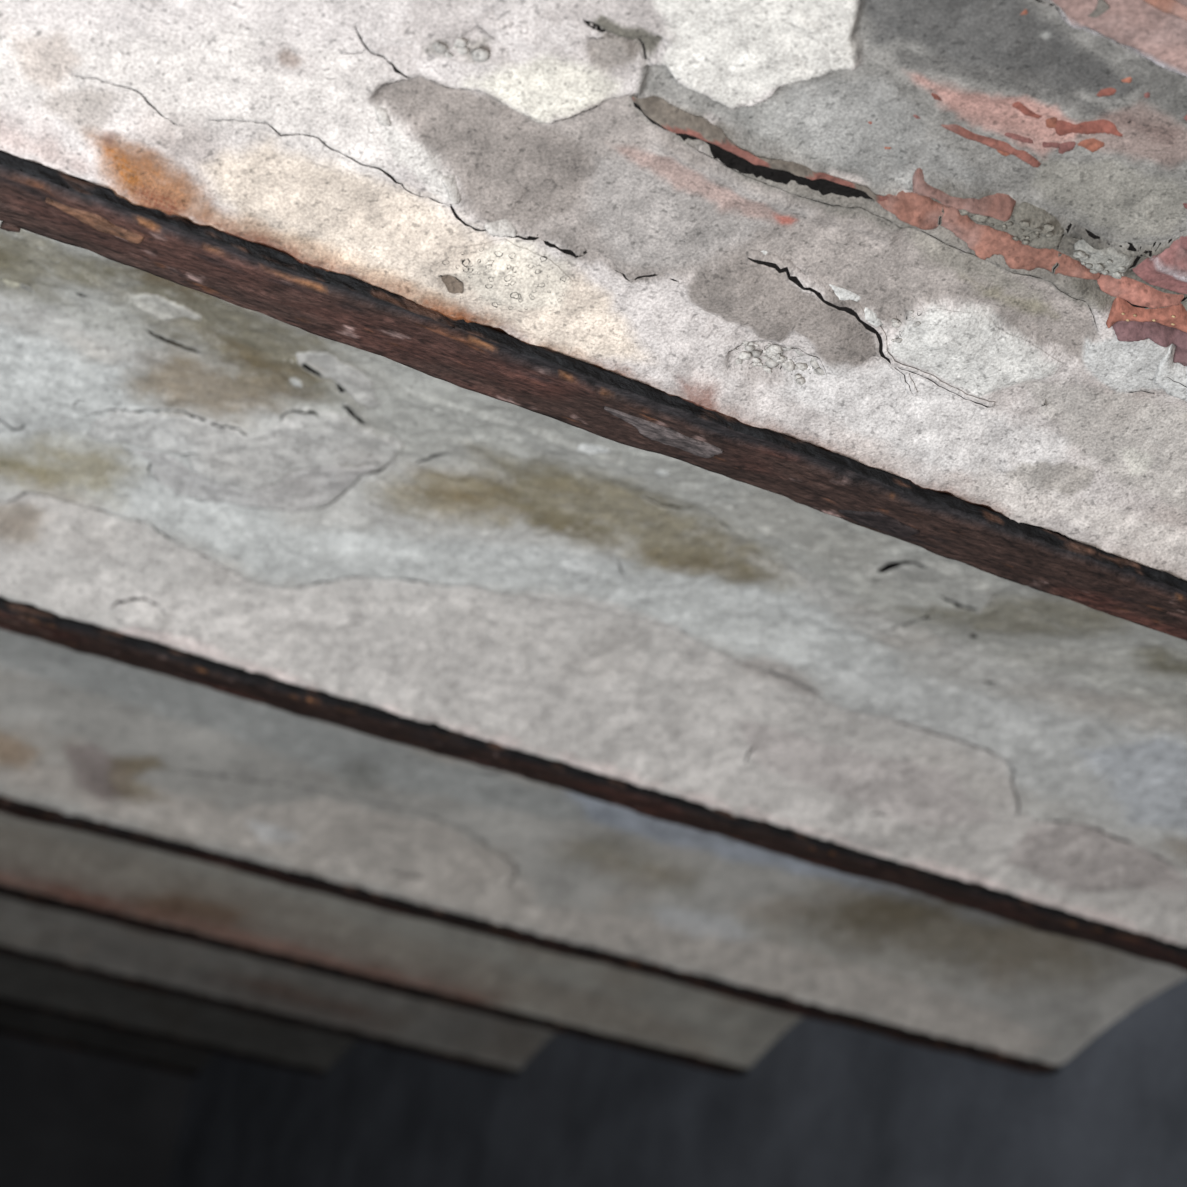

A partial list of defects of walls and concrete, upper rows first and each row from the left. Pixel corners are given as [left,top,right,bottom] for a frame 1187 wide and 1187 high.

crack [339,25,544,124]
rust [106,147,190,213]
crack [70,71,679,284]
spalling [373,0,1187,366]
crack [75,291,90,299]
crack [145,328,202,356]
leakage [139,270,321,386]
spalling [726,341,826,387]
crack [747,250,995,409]
crack [0,417,28,432]
crack [315,451,453,511]
crack [641,493,735,533]